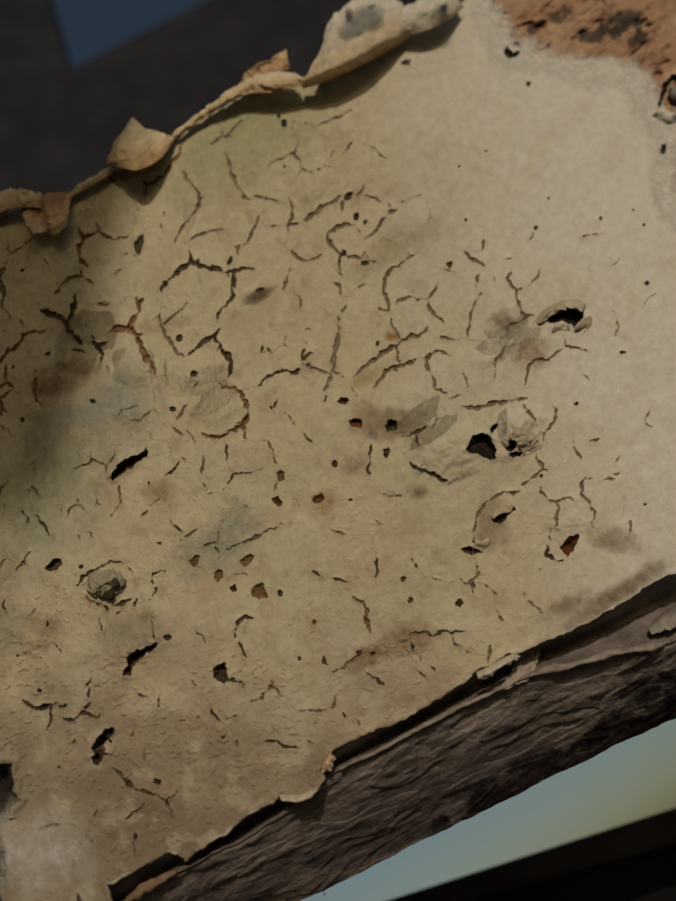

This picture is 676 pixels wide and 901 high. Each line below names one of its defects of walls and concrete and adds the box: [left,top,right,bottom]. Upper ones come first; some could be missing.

spalling [492,0,676,113]
peeling [0,0,464,236]
crack [0,109,632,621]
crack [0,662,101,745]
crack [76,560,166,639]
crack [191,614,361,749]
crack [312,570,385,686]
crack [409,629,492,681]
peeling [476,652,520,680]
peeling [649,607,676,634]
spalling [0,763,21,817]
damp [307,675,676,868]